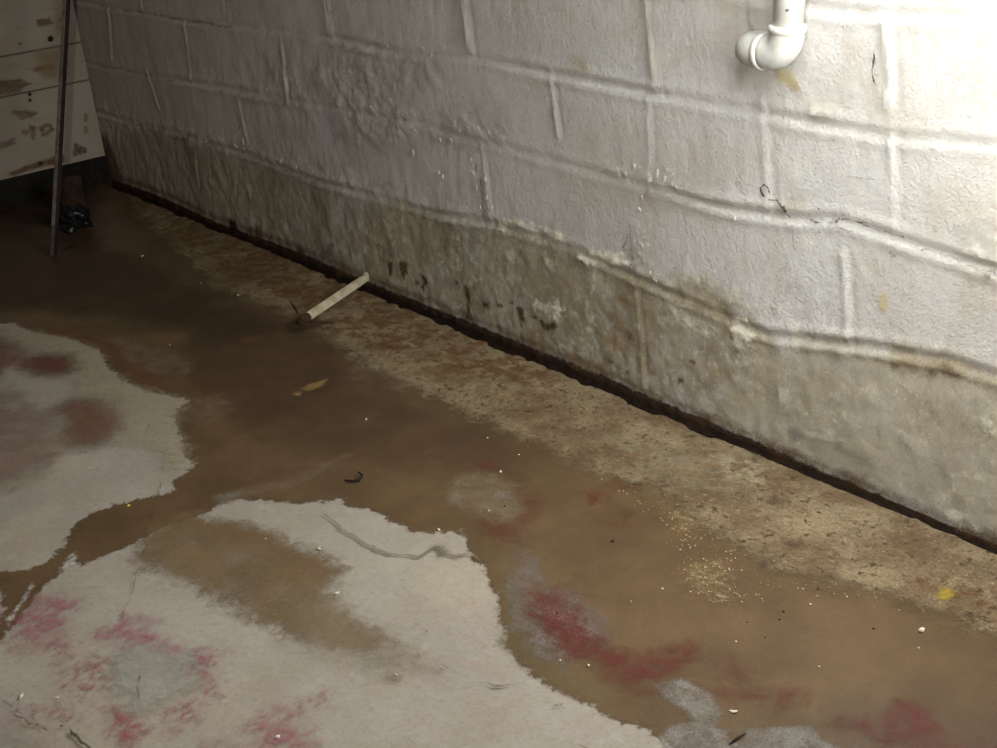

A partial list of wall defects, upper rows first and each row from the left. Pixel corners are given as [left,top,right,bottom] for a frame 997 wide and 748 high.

crack [760,184,996,279]
crack [324,514,479,560]
crack [0,698,90,748]